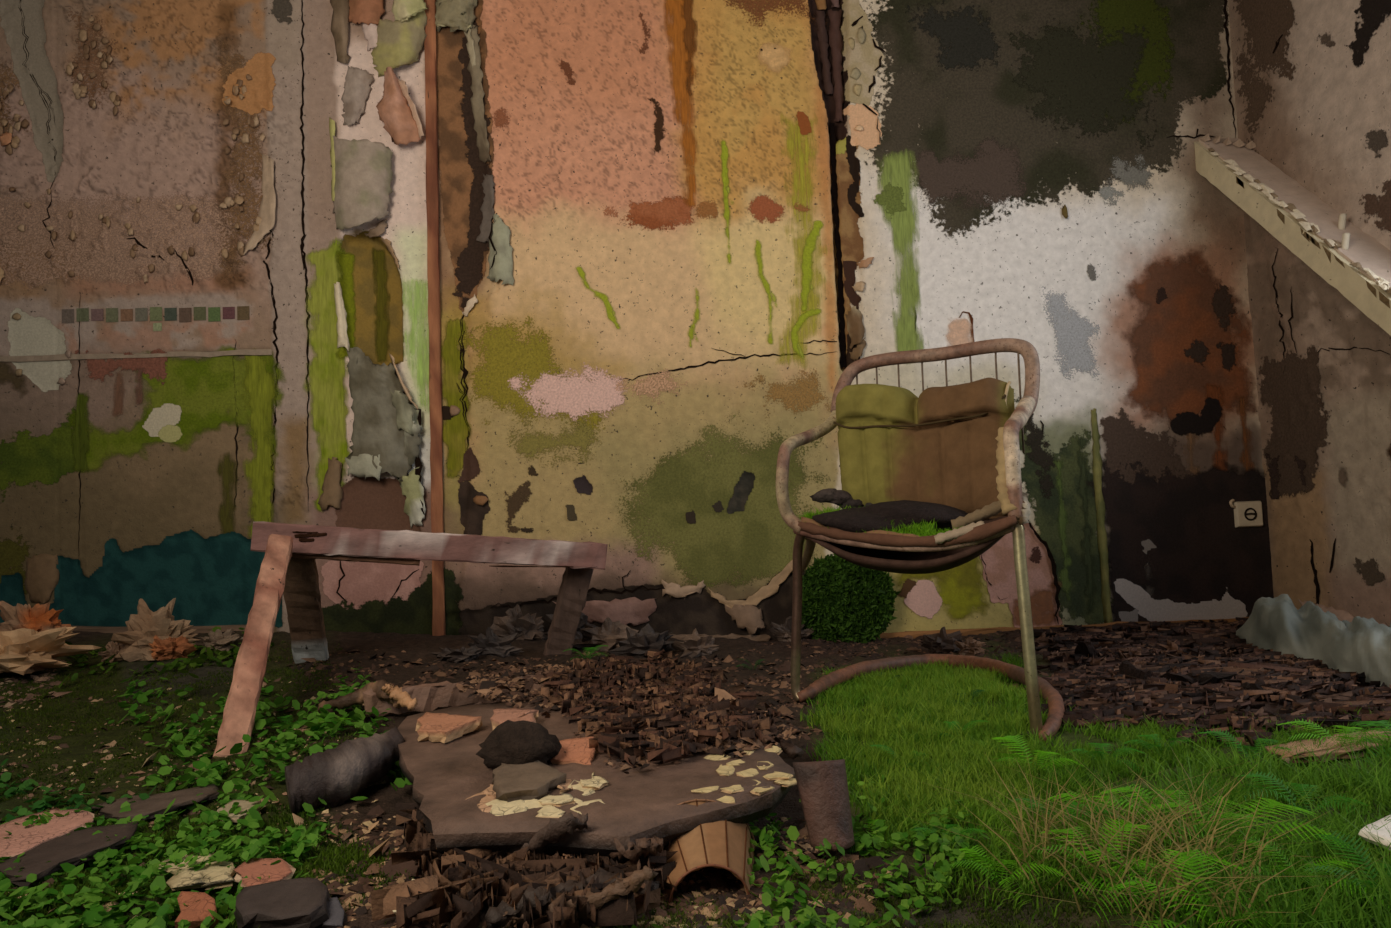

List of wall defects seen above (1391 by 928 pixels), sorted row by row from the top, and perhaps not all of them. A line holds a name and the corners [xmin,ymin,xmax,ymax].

spalling [330,0,514,316]
crack [619,0,850,380]
damp [861,0,1297,242]
damp [1317,0,1391,67]
damp [1364,129,1388,158]
peeling [0,529,265,627]
peeling [334,231,426,532]
spalling [458,595,558,635]
spalling [582,560,806,640]
damp [618,414,830,590]
damp [1019,345,1332,625]
corrosion [1125,252,1256,475]